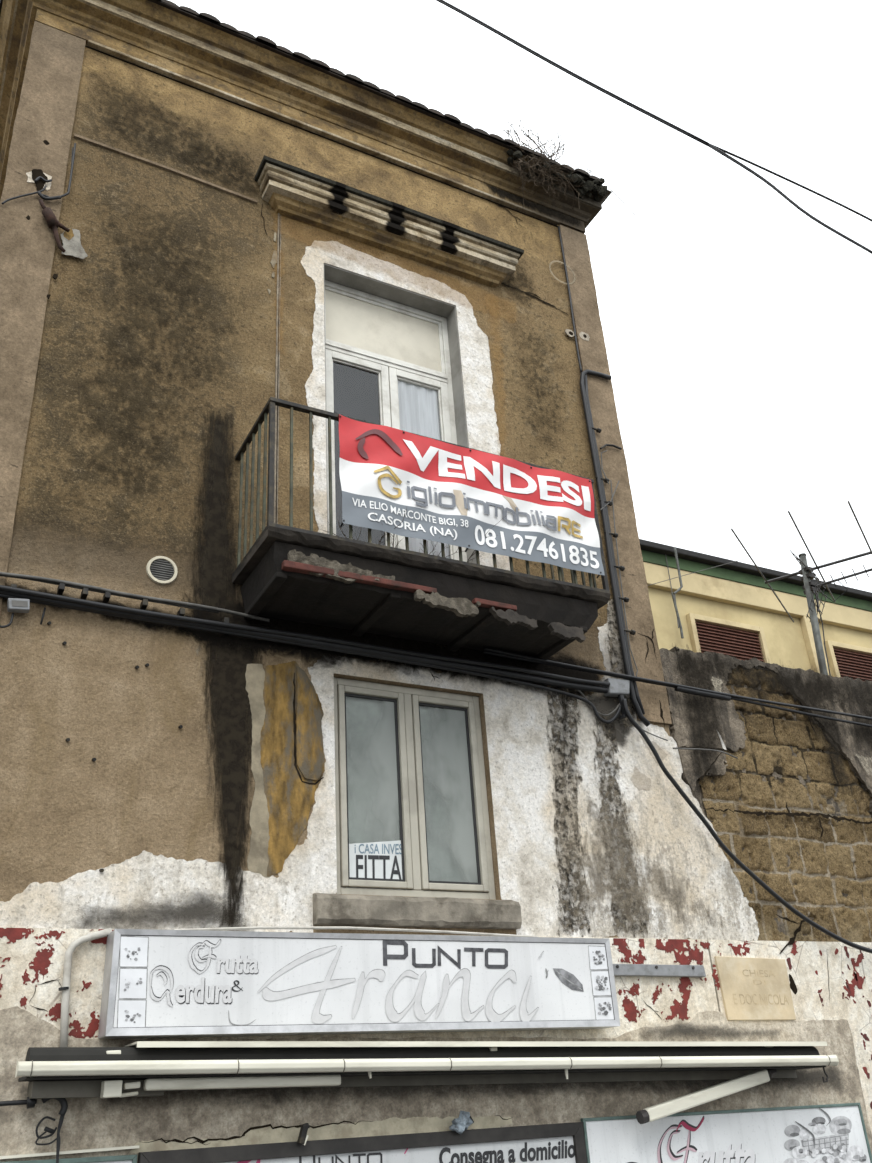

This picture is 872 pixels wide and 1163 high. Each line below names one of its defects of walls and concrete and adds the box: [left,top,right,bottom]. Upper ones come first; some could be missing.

leakage [101,85,257,193]
leakage [88,218,213,489]
peeling [301,240,501,534]
spalling [287,549,395,584]
peeling [479,551,510,570]
leakage [2,412,722,937]
peeling [0,589,872,1023]
peeling [45,1003,100,1039]
crack [144,1121,372,1145]